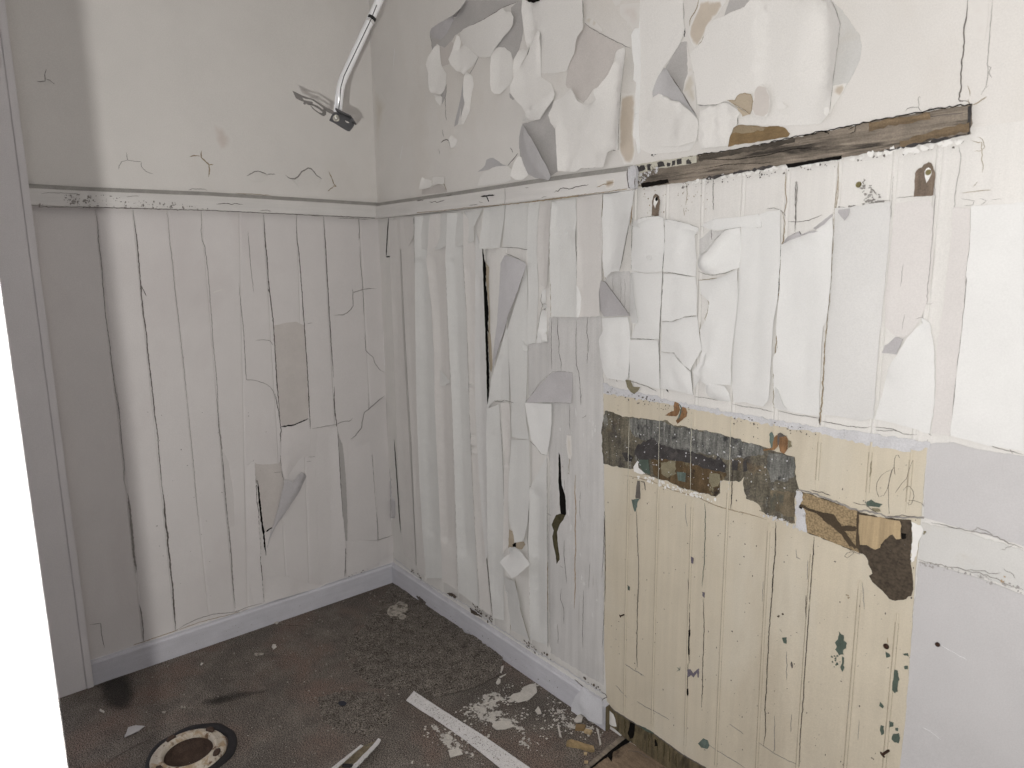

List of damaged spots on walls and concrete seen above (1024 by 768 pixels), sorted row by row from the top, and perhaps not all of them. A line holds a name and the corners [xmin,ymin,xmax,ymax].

peeling [478,157,528,186]
peeling [425,0,840,172]
peeling [914,162,935,197]
crack [43,151,390,645]
peeling [245,322,348,605]
crack [372,442,401,540]
crack [530,441,606,645]
peeling [389,189,1024,645]